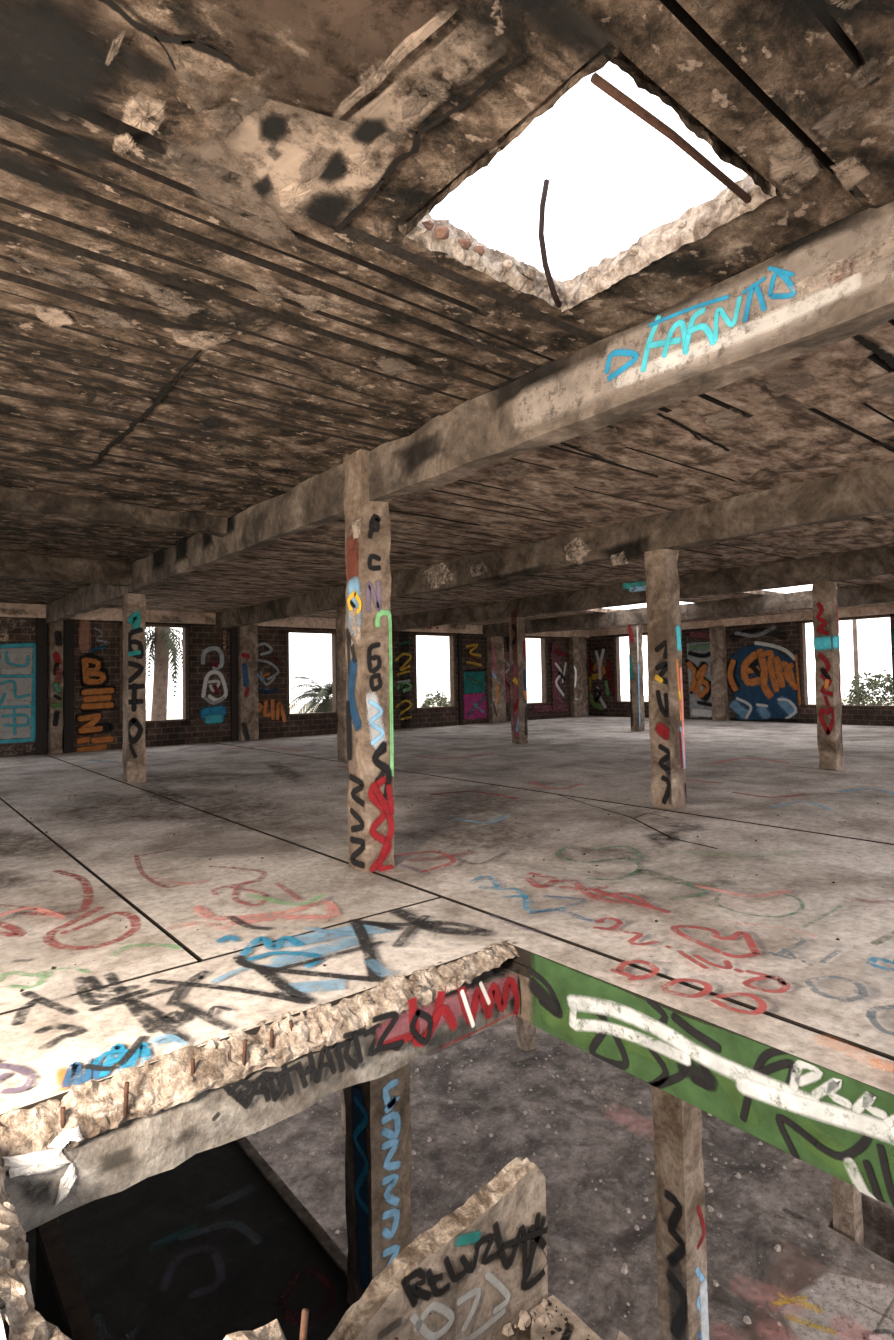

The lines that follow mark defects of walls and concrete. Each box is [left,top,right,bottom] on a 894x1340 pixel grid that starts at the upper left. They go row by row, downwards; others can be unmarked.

peeling [105,33,125,66]
crack [99,0,256,76]
peeling [113,99,165,155]
peeling [812,60,894,142]
leakage [253,176,272,195]
leakage [302,194,350,224]
spalling [398,42,871,312]
spalling [793,236,894,300]
crack [91,350,202,465]
spalling [0,939,520,1340]